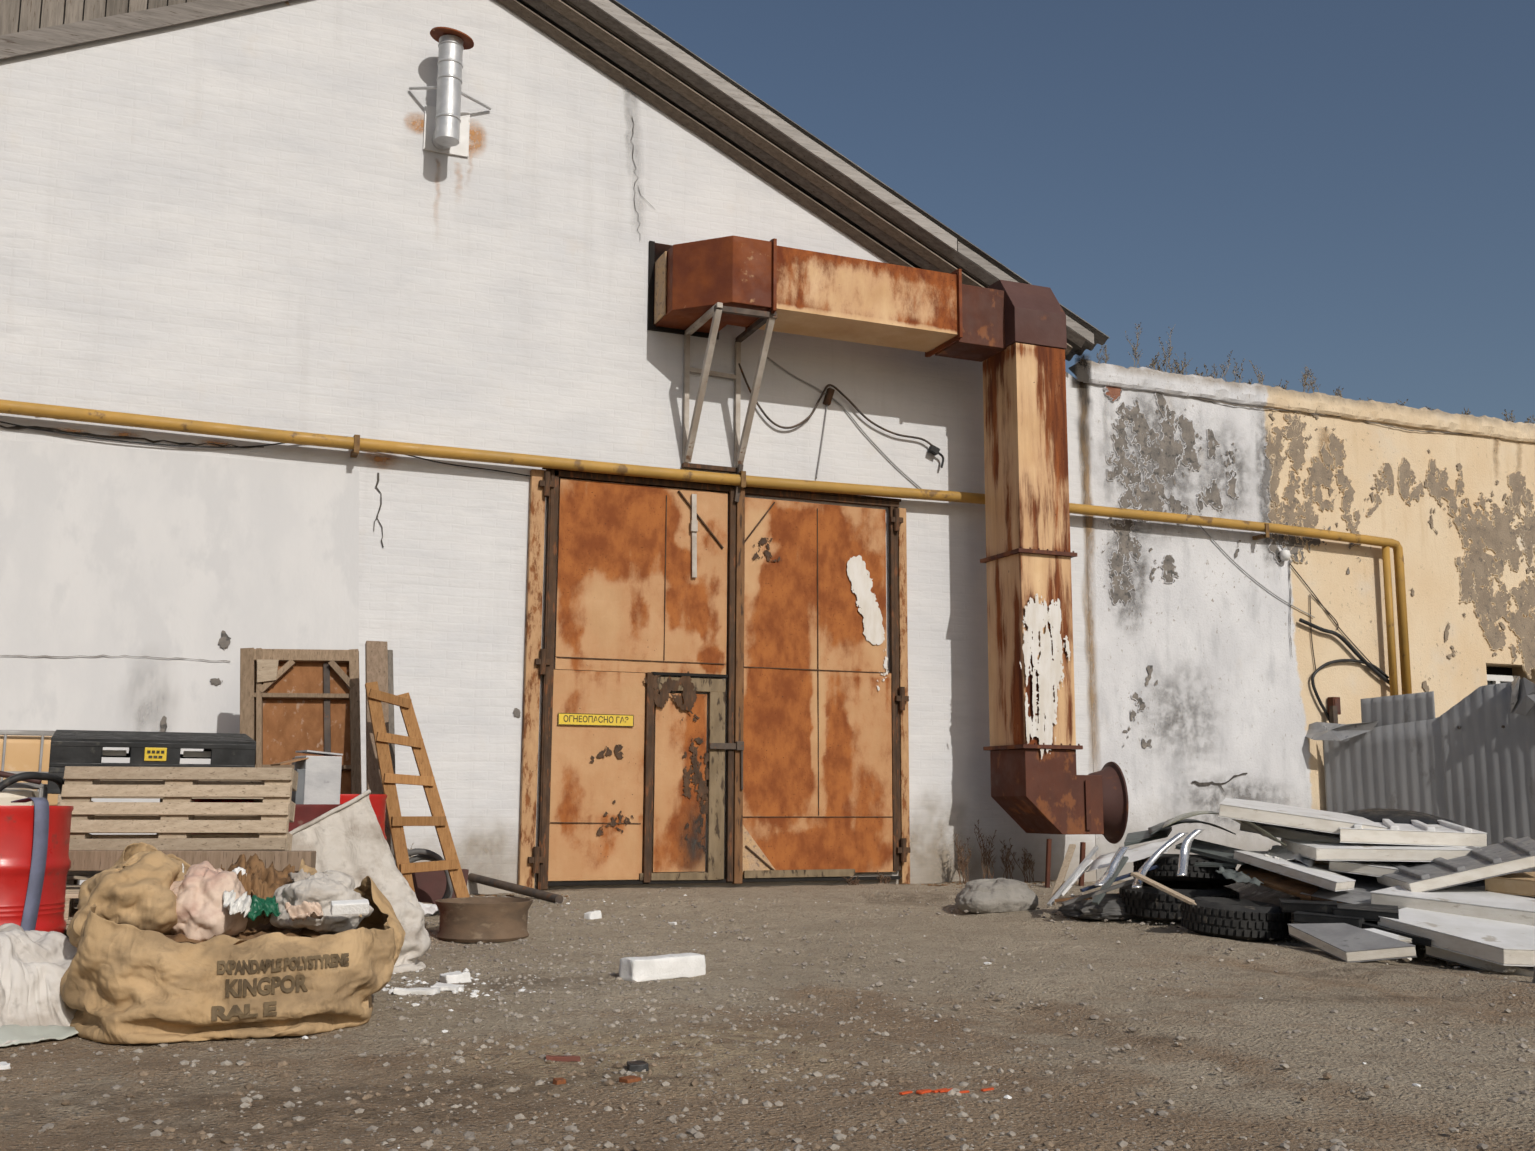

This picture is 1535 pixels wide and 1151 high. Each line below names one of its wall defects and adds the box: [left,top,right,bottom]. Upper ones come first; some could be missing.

corrosion [469,129,482,150]
crack [631,118,654,235]
crack [373,473,384,547]
peeling [1102,386,1240,609]
peeling [1264,412,1535,679]